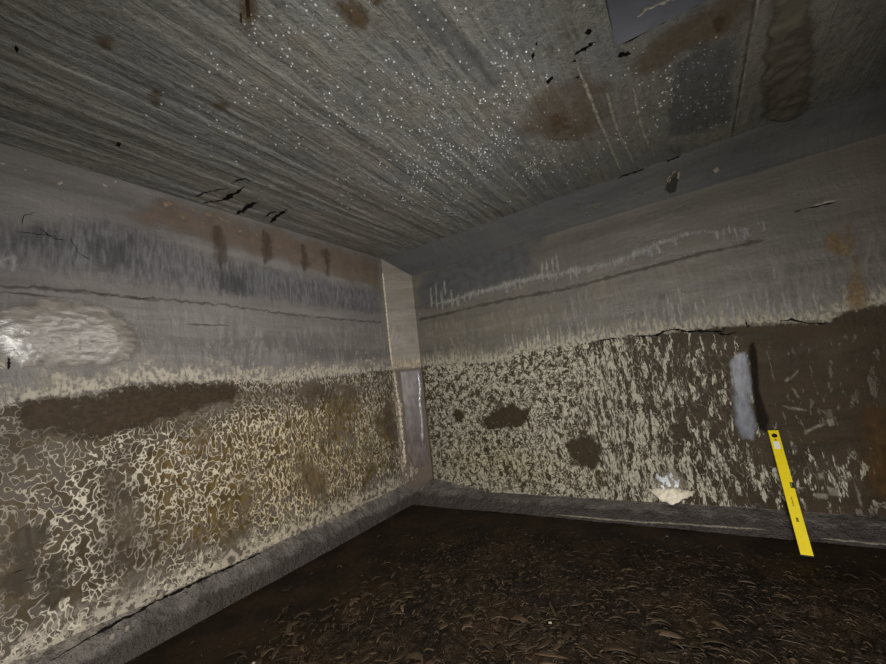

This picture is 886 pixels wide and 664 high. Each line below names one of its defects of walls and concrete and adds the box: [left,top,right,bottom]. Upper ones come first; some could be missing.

rust [240,0,254,22]
crack [196,178,287,223]
crack [590,320,750,343]
crack [781,317,827,325]
water stain [0,226,886,664]